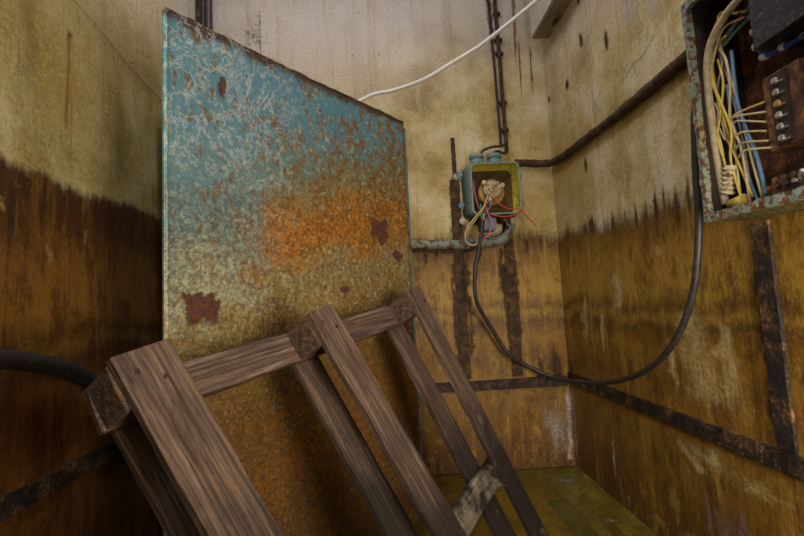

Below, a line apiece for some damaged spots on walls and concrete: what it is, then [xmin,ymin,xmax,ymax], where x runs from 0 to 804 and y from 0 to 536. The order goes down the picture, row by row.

rust [512,0,533,93]
rust [412,250,460,363]
rust [499,248,511,353]
leakage [412,180,804,536]